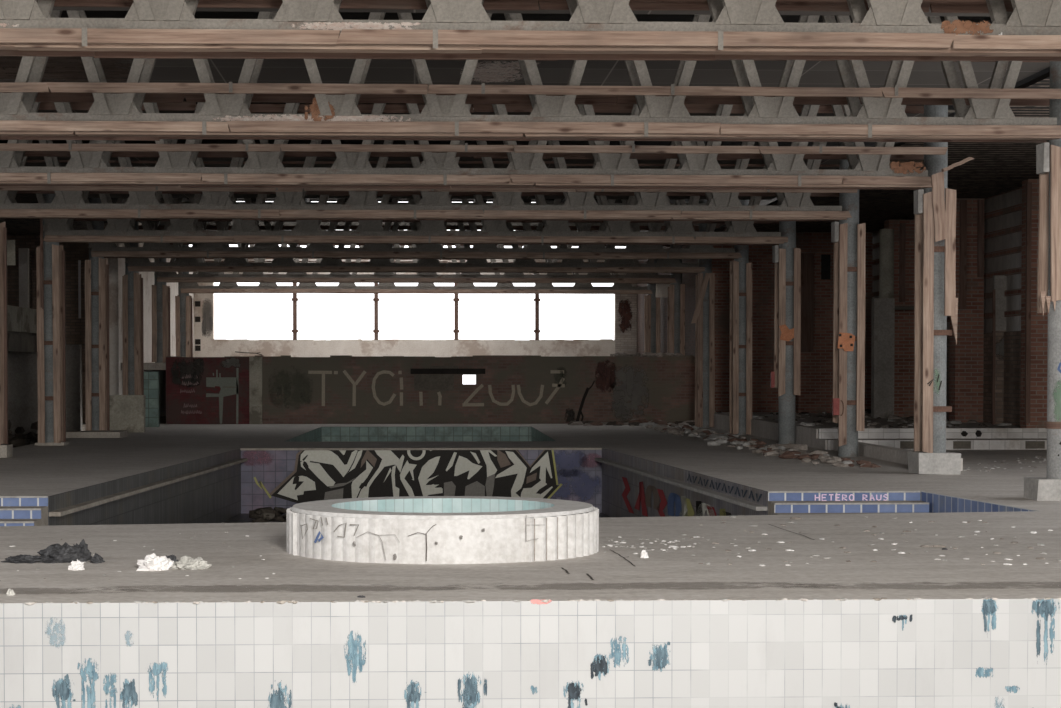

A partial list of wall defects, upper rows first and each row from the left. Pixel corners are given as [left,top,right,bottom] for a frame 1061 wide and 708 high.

peeling [77,658,117,708]
peeling [344,631,366,683]